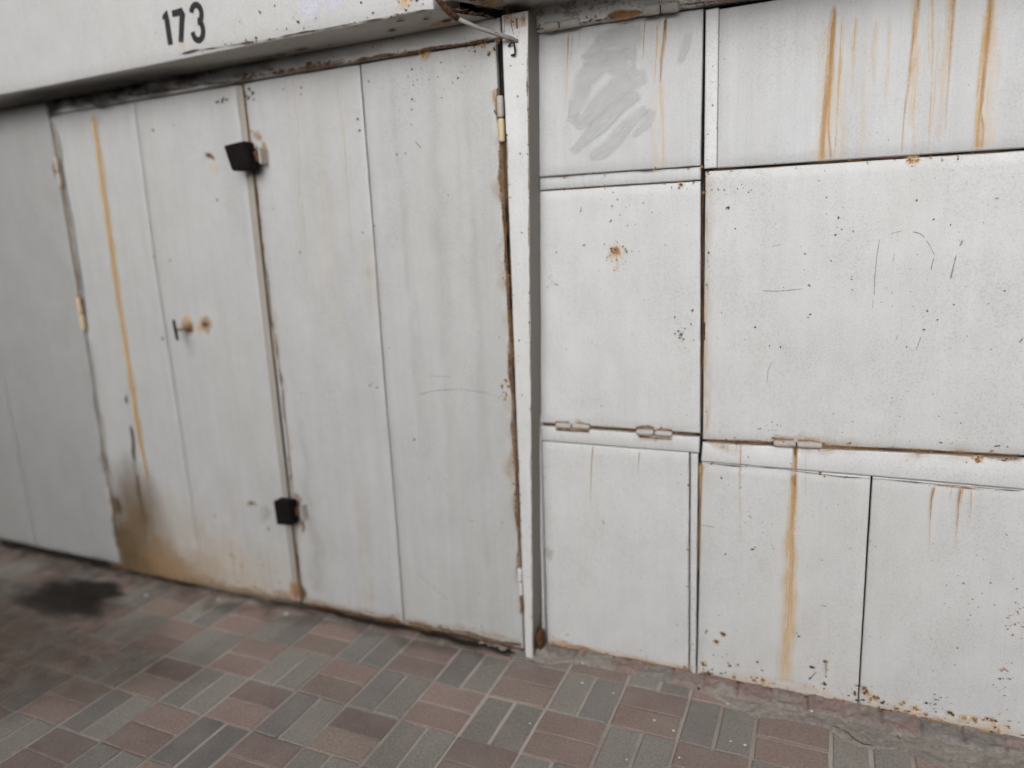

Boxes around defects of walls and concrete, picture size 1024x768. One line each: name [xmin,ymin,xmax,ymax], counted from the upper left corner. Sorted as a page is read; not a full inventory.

rust [795,0,994,169]
rust [92,116,147,475]
rust [252,164,299,498]
rust [495,134,533,568]
rust [579,165,735,286]
leakage [0,482,515,654]
rust [275,522,542,654]
rust [551,422,1019,666]
rust [787,660,1024,736]